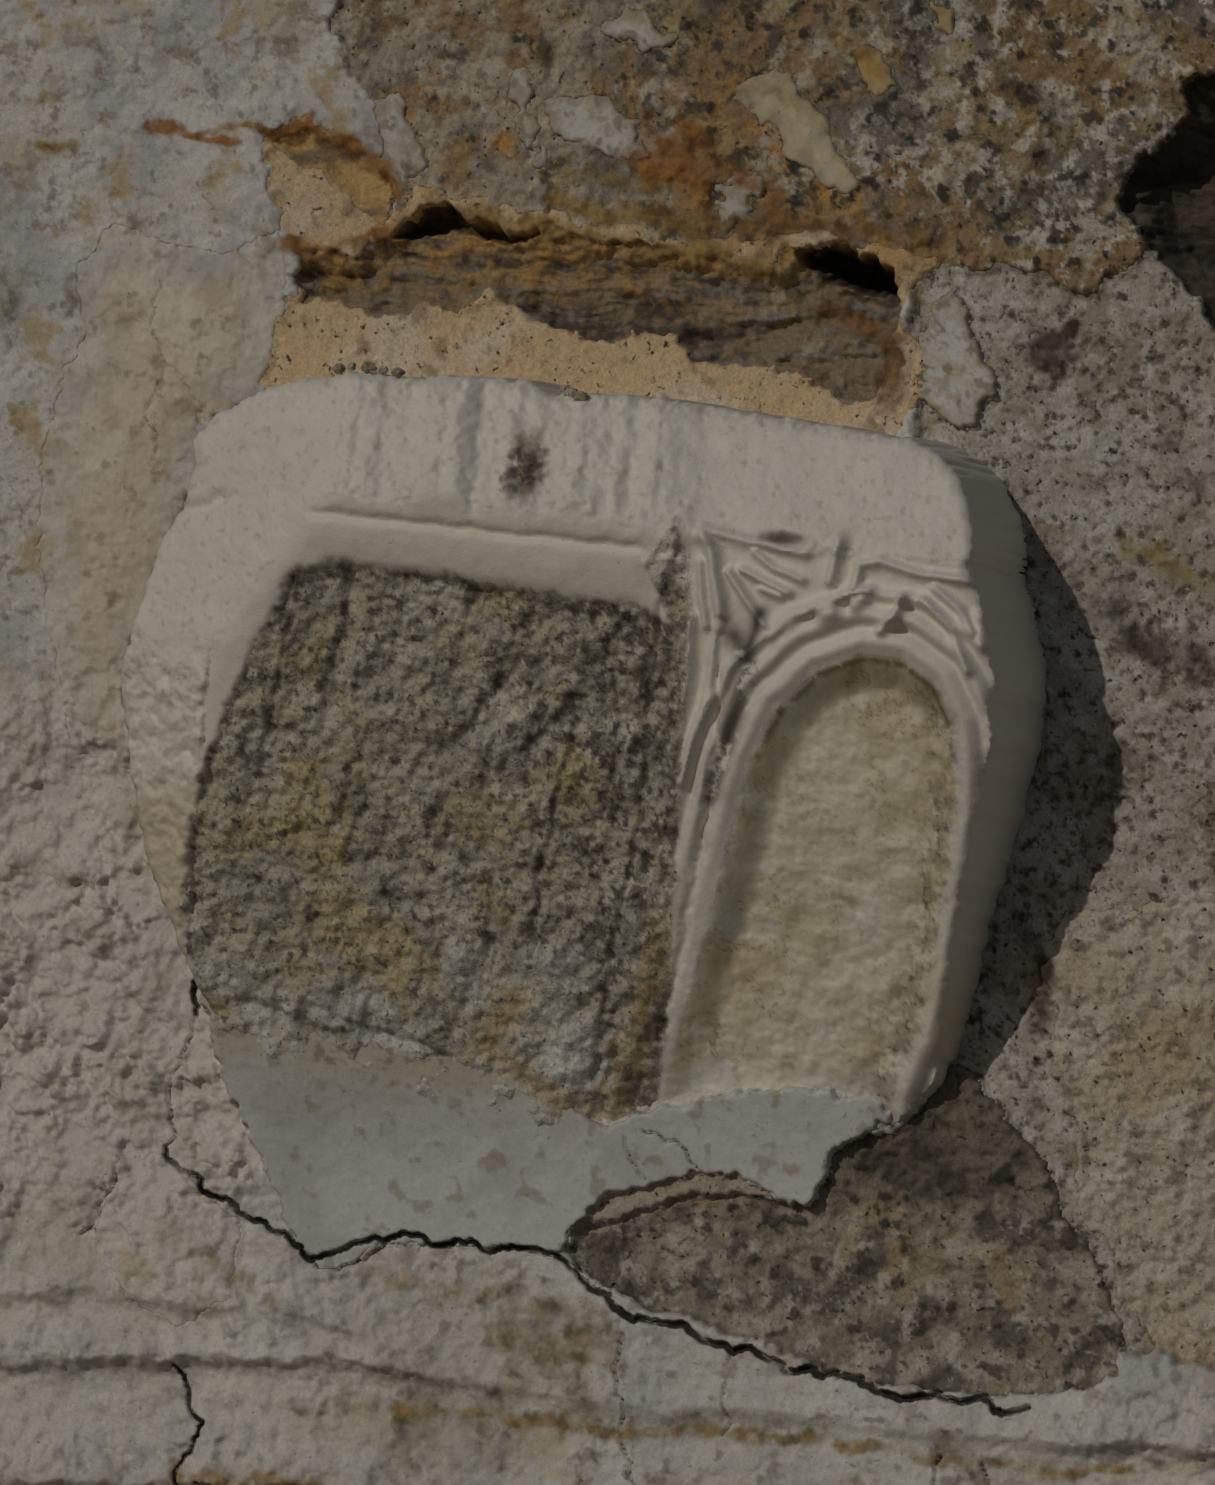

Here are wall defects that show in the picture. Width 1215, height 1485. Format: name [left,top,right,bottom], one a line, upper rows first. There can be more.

corrosion [143,112,401,202]
corrosion [283,234,334,258]
peeling [259,0,1215,1397]
crack [190,979,199,1016]
crack [164,1147,1011,1417]
crack [172,1364,205,1485]